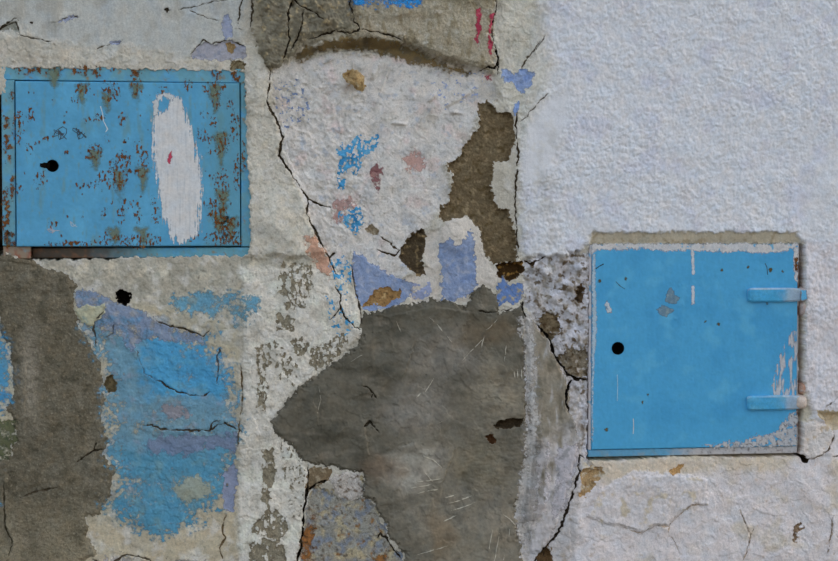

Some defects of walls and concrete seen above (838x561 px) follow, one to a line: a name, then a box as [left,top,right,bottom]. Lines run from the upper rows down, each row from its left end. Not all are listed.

crack [266,0,400,330]
peeling [431,69,535,282]
spalling [103,375,117,393]
crack [137,320,221,396]
crack [147,365,243,444]
peeling [255,228,427,412]
crack [479,301,586,411]
crack [534,454,584,561]
crack [626,504,705,551]